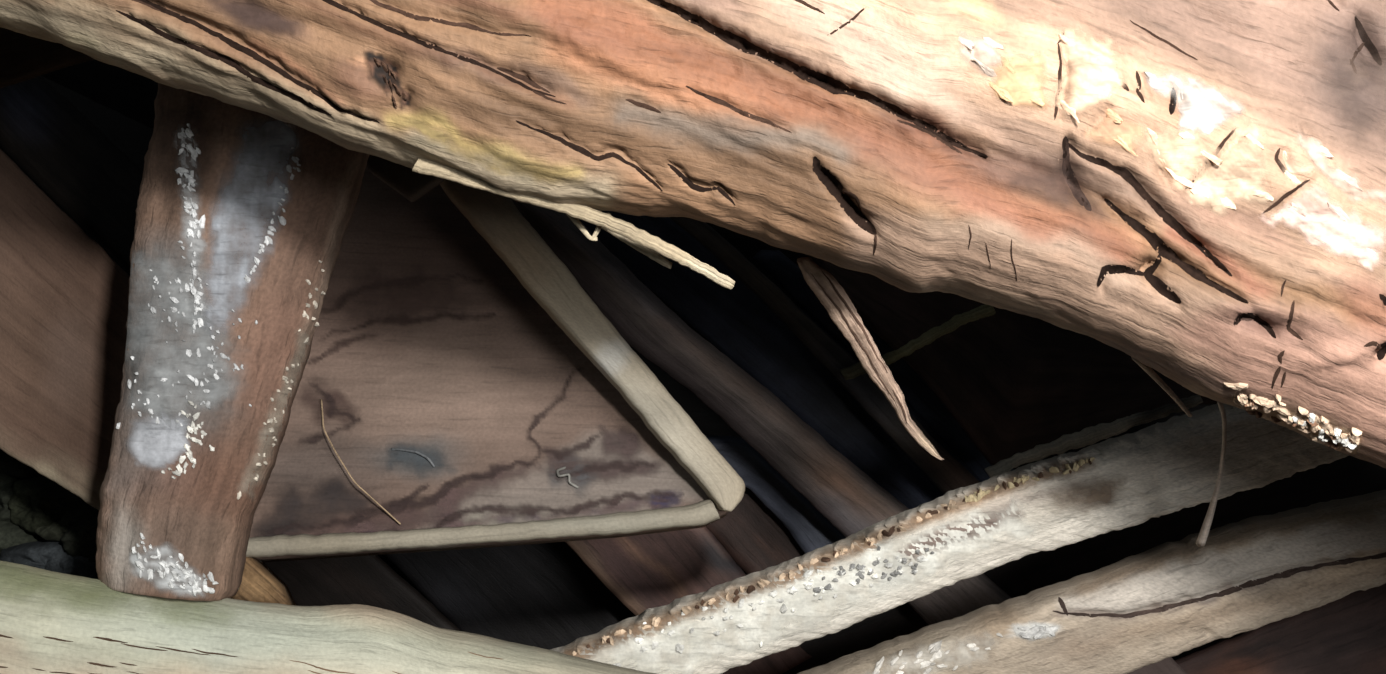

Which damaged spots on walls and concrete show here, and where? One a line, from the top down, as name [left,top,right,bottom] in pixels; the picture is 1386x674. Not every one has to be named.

leakage [116,114,301,479]
crack [116,0,379,123]
crack [322,0,735,205]
crack [812,156,877,256]
peeling [958,31,1386,269]
crack [1054,32,1309,389]
crack [1053,552,1386,618]